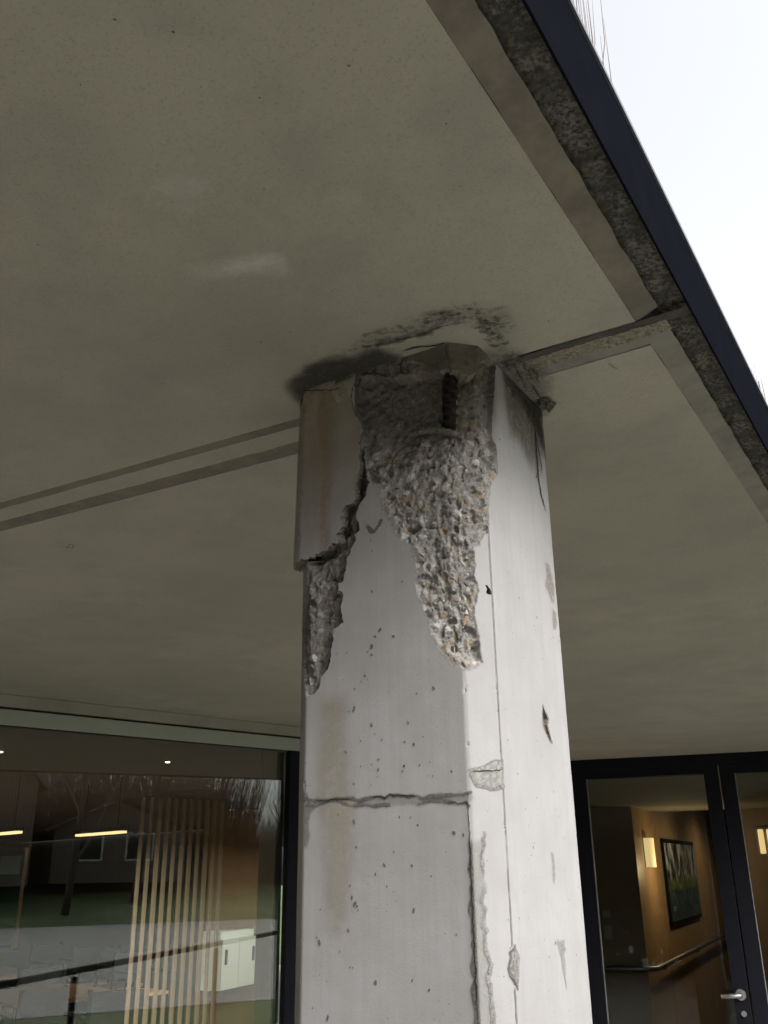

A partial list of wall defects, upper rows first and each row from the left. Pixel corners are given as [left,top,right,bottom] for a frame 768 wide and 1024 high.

leakage [291,308,545,407]
crack [529,397,546,510]
spalling [302,358,500,697]
crack [303,512,518,1024]
peeling [469,760,505,791]
peeling [508,945,520,990]